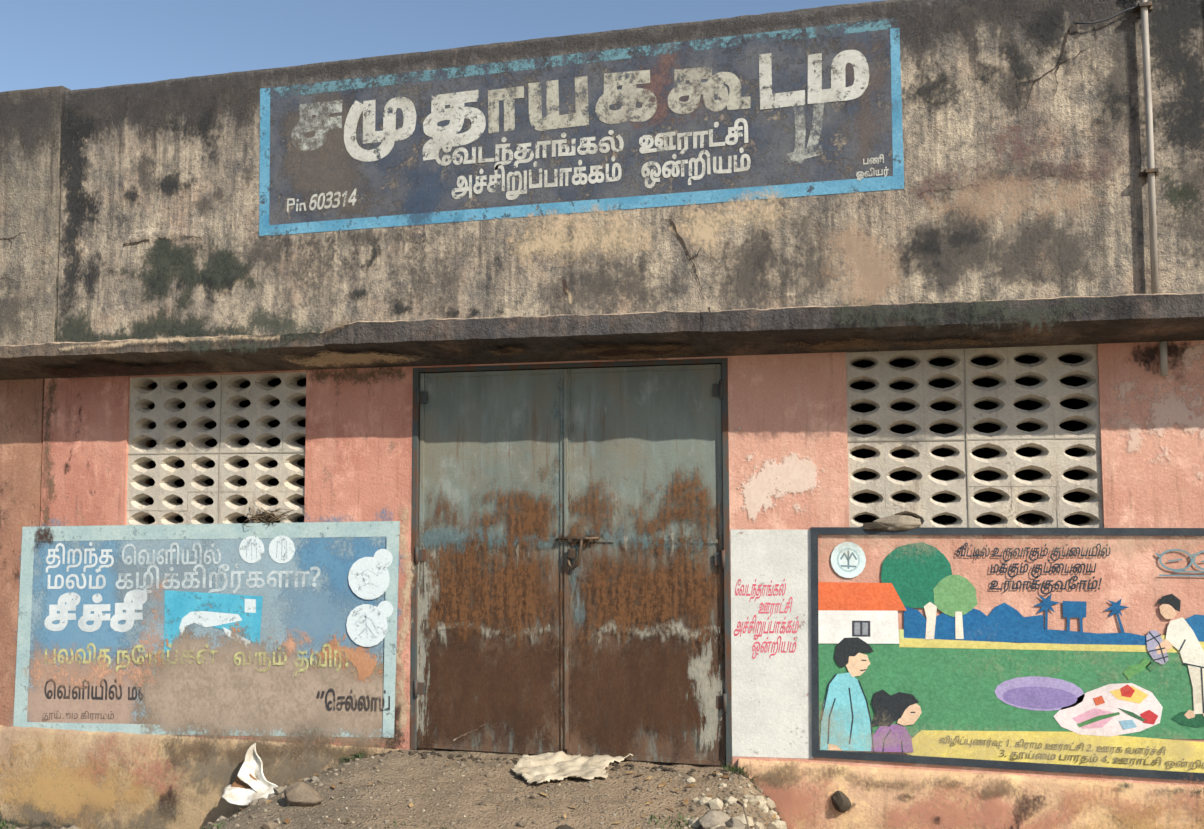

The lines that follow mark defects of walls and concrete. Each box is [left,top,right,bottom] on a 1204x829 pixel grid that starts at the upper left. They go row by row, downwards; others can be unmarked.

leakage [915,0,1079,109]
leakage [36,85,257,313]
leakage [899,159,1122,291]
leakage [1092,0,1204,266]
peeling [738,452,824,522]
peeling [271,629,382,683]
rust [417,467,725,759]